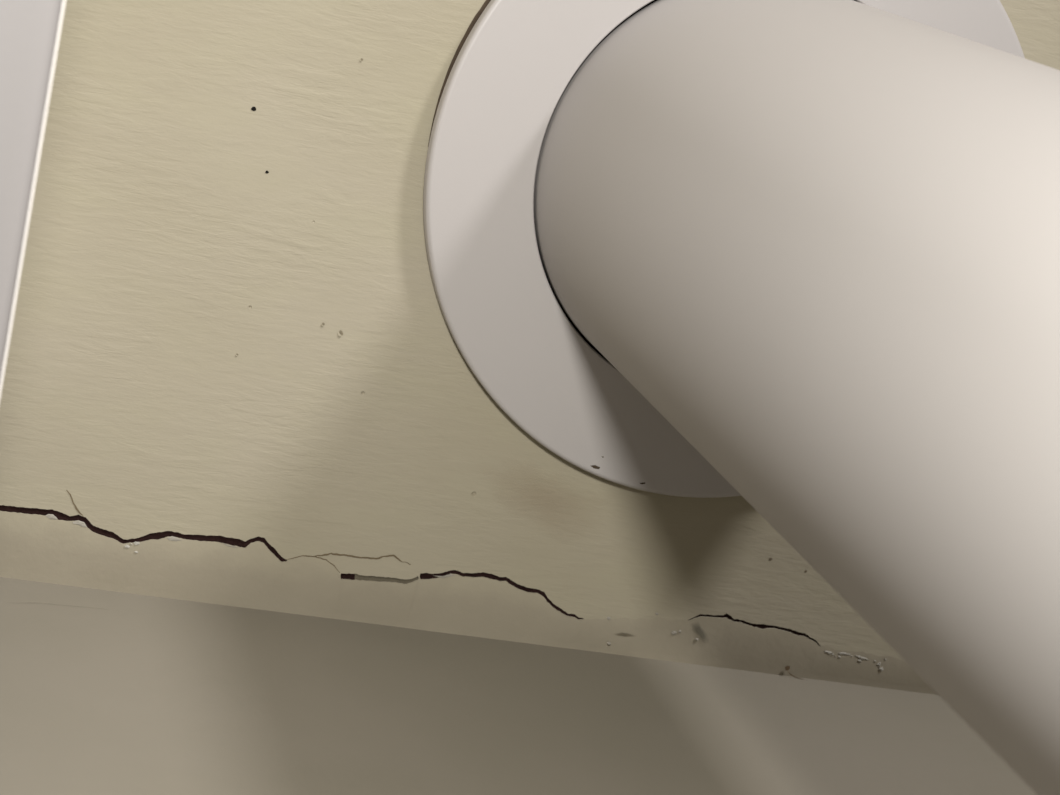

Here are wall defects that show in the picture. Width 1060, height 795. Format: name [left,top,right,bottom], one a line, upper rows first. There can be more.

crack [0,490,583,619]
crack [689,614,820,646]